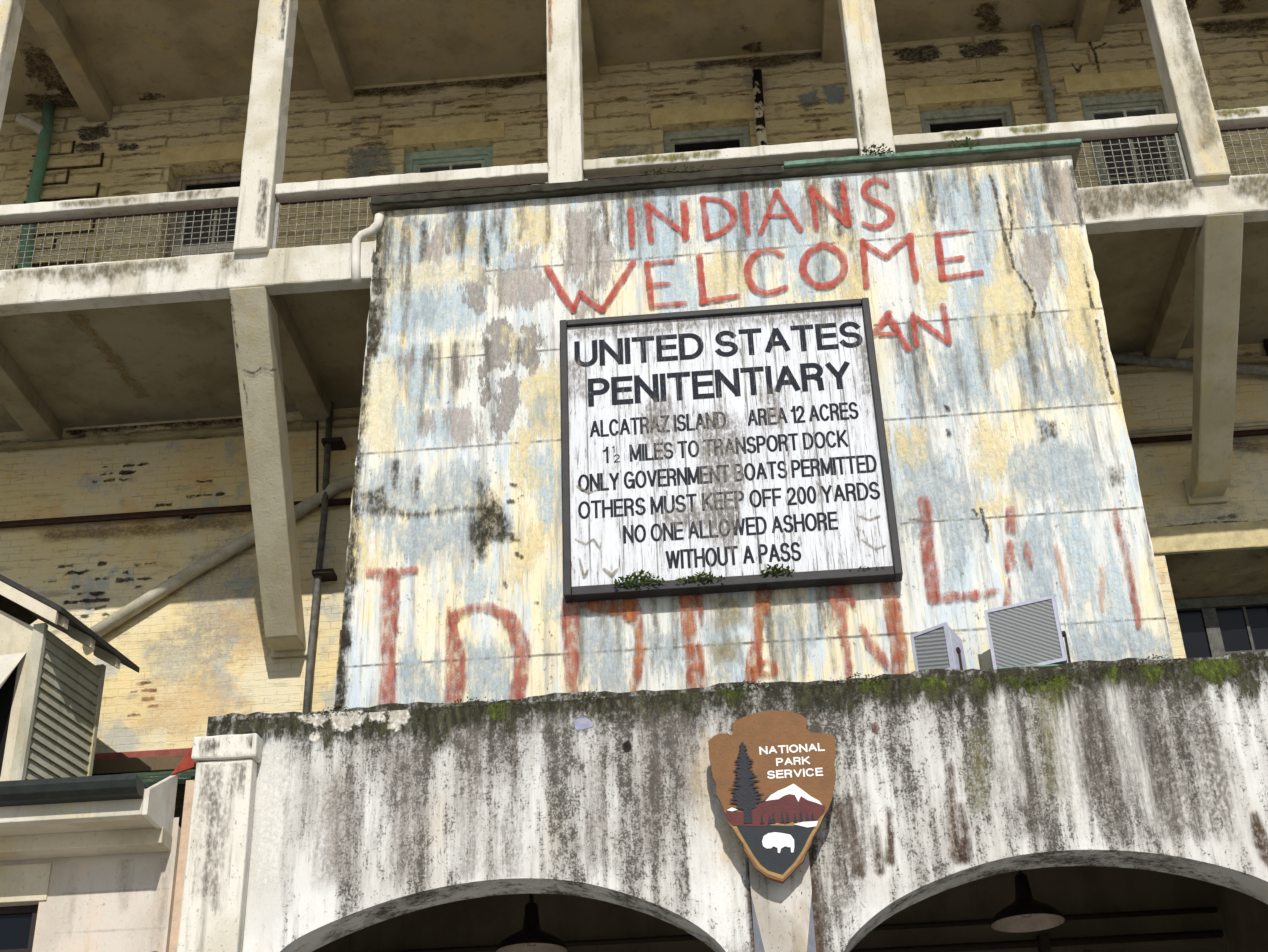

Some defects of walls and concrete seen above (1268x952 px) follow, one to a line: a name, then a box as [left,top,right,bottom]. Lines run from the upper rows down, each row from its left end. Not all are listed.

water stain [6,258,180,280]
water stain [805,177,846,235]
water stain [911,168,937,218]
crack [989,175,1037,318]
water stain [574,306,860,337]
peeling [92,463,149,483]
water stain [200,205,747,751]
peeling [43,561,157,618]
water stain [766,591,1268,836]
water stain [204,769,220,898]
water stain [746,863,755,952]
water stain [808,800,866,952]